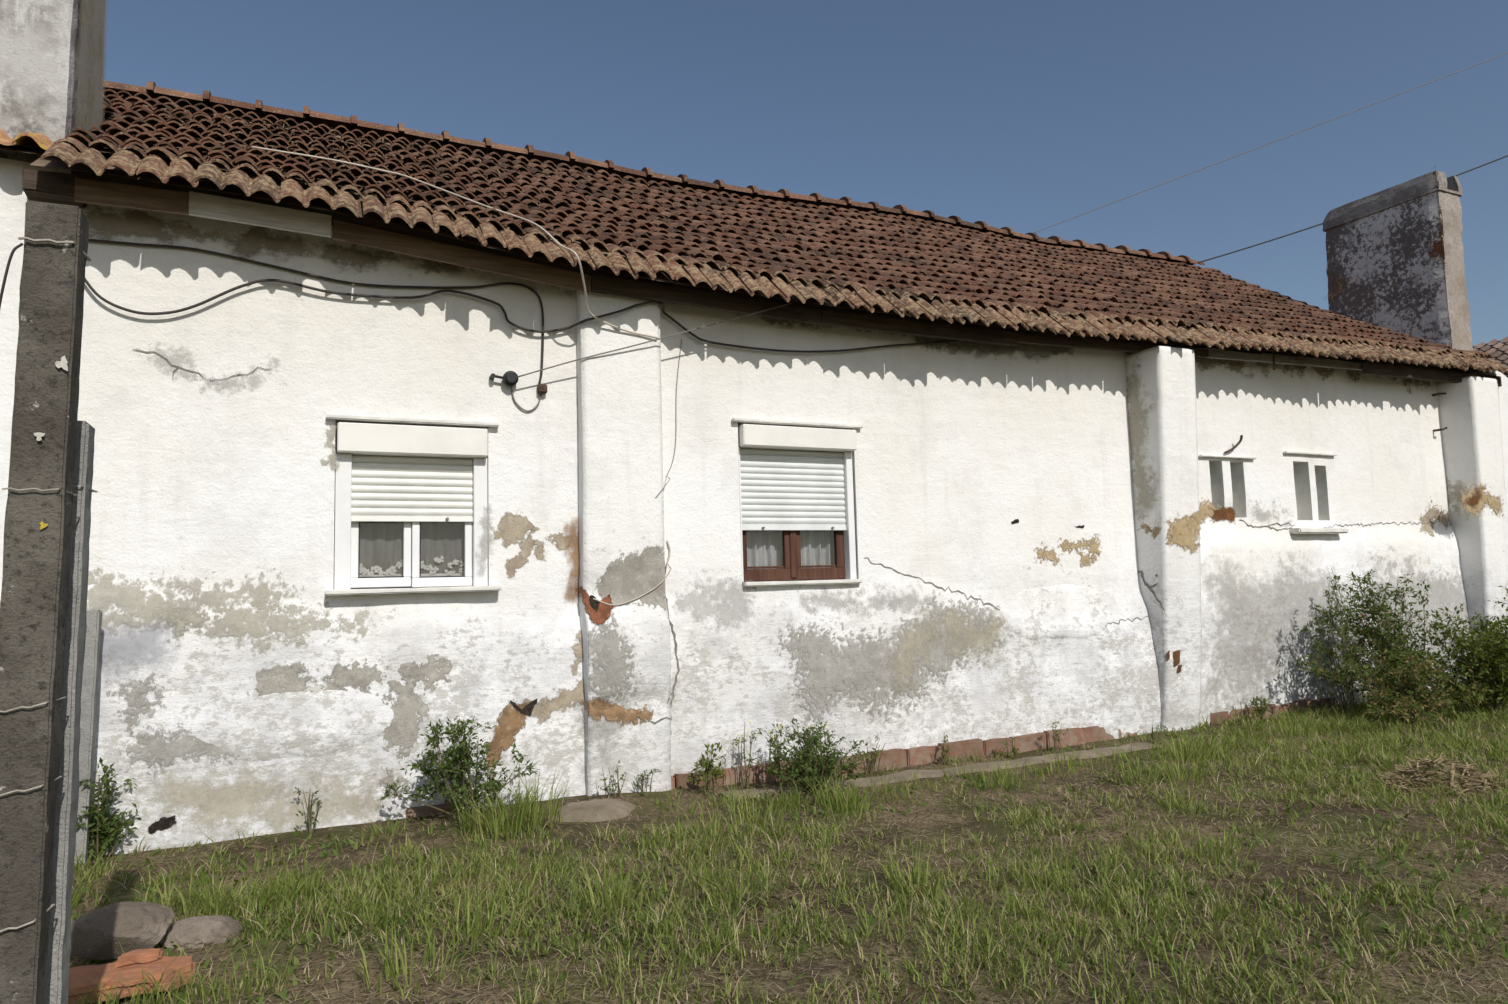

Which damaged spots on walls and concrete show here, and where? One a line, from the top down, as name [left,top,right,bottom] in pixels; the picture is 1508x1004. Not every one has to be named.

crack [132,349,266,381]
leakage [1126,365,1159,525]
peeling [479,508,572,578]
peeling [1033,525,1101,567]
peeling [1137,497,1236,553]
spalling [1420,481,1504,537]
leakage [87,566,369,664]
leakage [676,583,755,628]
crack [865,557,1000,611]
peeling [483,545,667,776]
crack [649,570,680,735]
leakage [157,773,378,833]